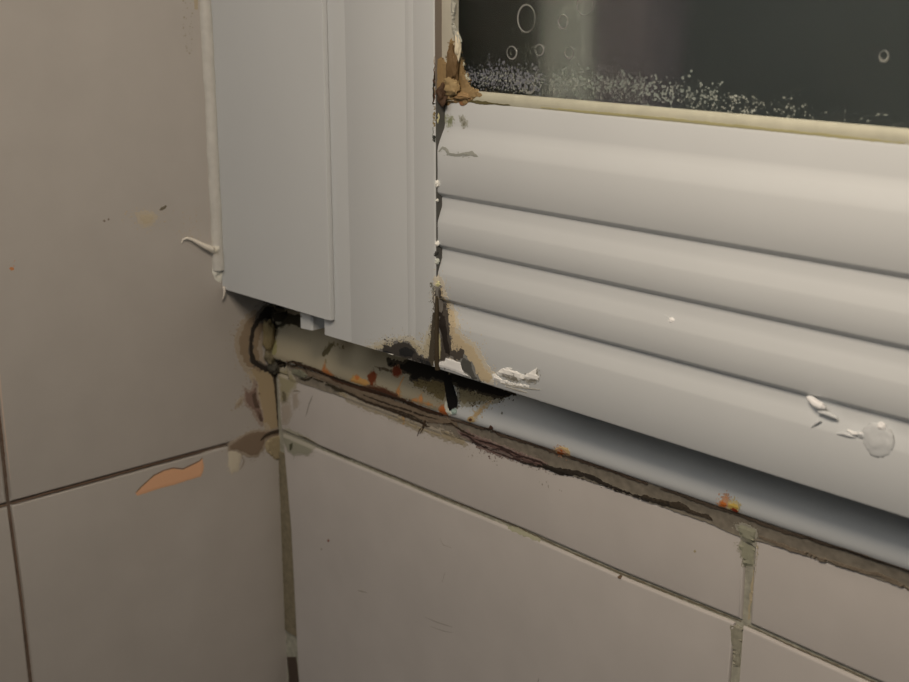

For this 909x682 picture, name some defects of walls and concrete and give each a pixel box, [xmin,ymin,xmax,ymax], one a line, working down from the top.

water stain [365,269,517,416]
rust [314,361,451,419]
water stain [225,301,548,472]
peeling [492,368,539,388]
peeling [136,459,204,496]
crack [261,363,909,682]
rust [715,490,743,515]